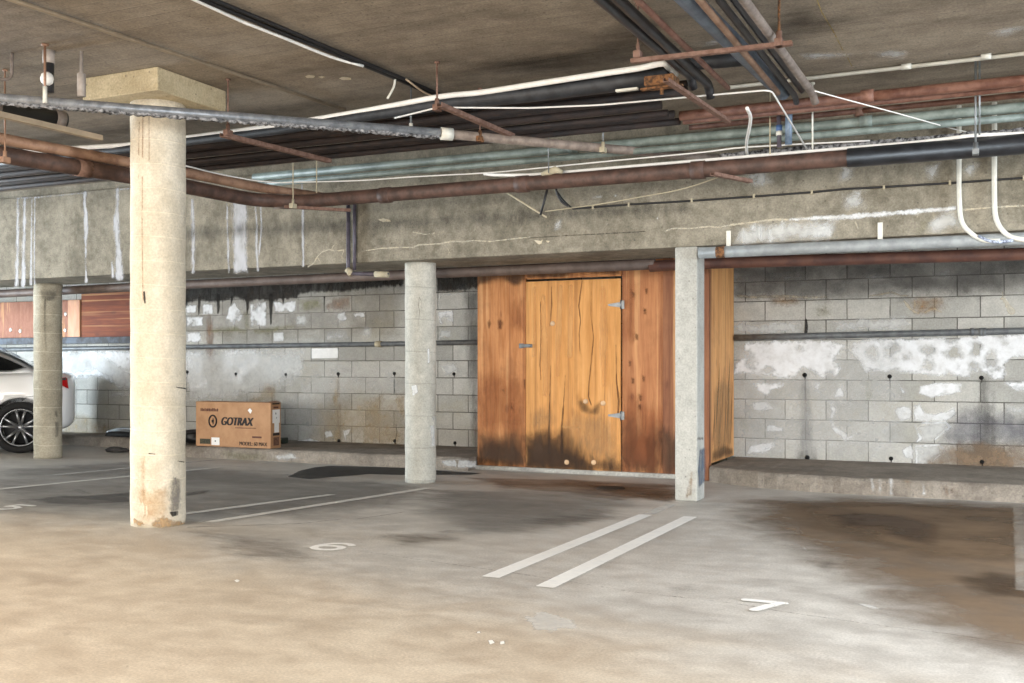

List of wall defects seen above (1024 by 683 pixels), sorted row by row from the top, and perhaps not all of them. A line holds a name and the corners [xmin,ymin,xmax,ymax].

leakage [15,197,39,287]
leakage [111,188,128,280]
leakage [226,203,262,272]
leakage [713,319,1024,464]
leakage [288,466,405,479]
leakage [436,419,675,501]
leakage [757,499,1024,649]